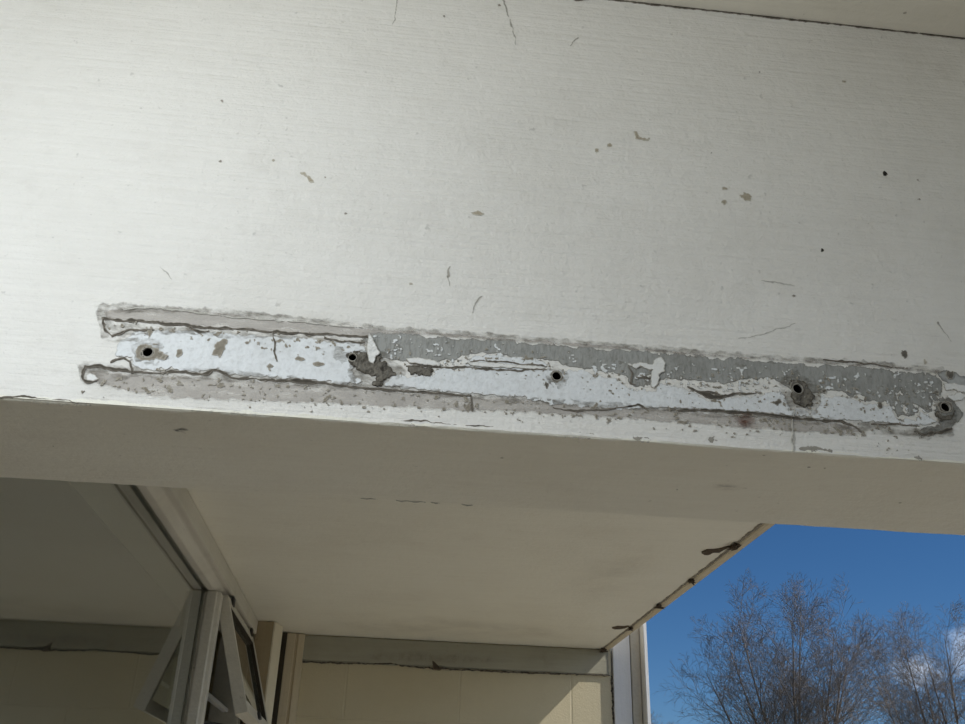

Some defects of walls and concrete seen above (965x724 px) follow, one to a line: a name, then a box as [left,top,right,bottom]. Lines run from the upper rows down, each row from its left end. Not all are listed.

peeling [79,305,965,461]